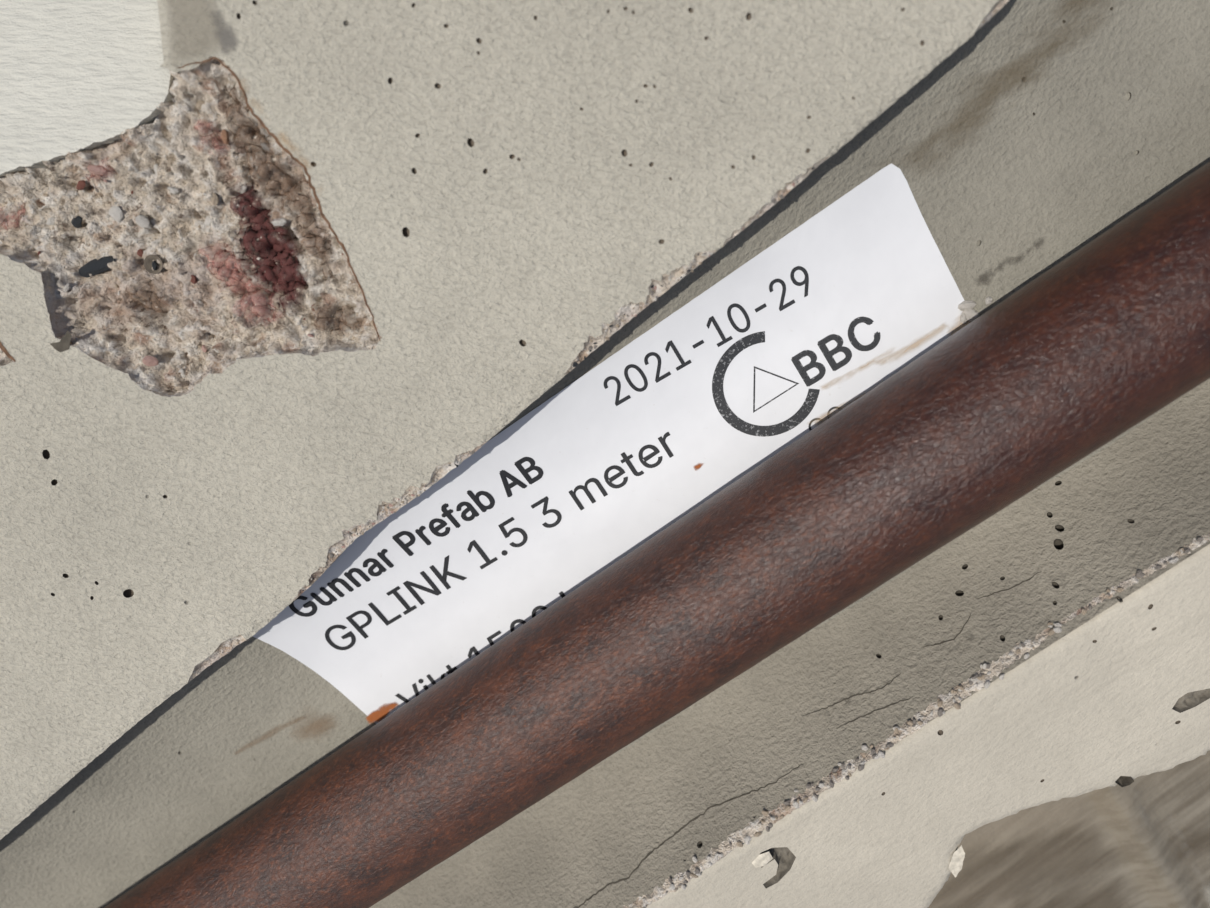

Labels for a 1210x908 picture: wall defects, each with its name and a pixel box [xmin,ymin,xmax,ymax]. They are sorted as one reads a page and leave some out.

spalling [0,57,382,397]
rust [209,93,326,321]
crack [925,572,1040,647]
rust [366,703,398,723]
crack [803,673,910,728]
spalling [623,533,1210,908]
crack [574,764,803,908]